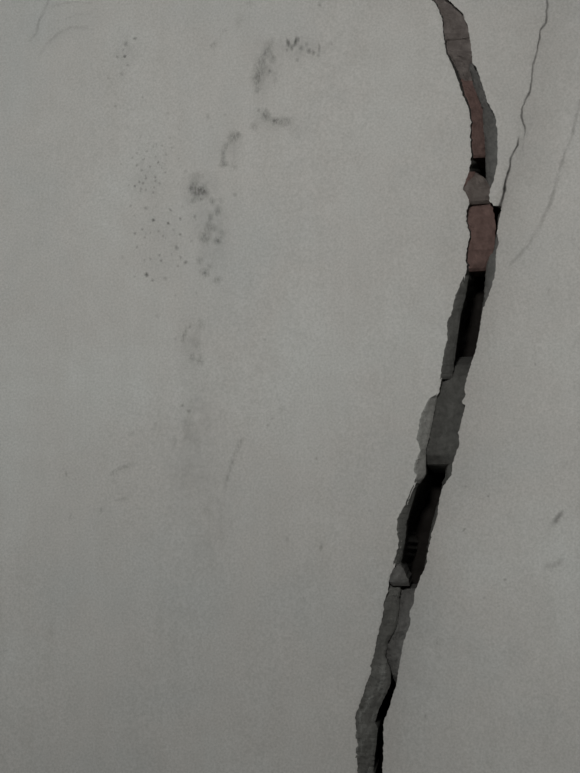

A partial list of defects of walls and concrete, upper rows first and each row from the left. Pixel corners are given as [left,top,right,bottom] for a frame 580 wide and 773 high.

crack [355,0,518,773]